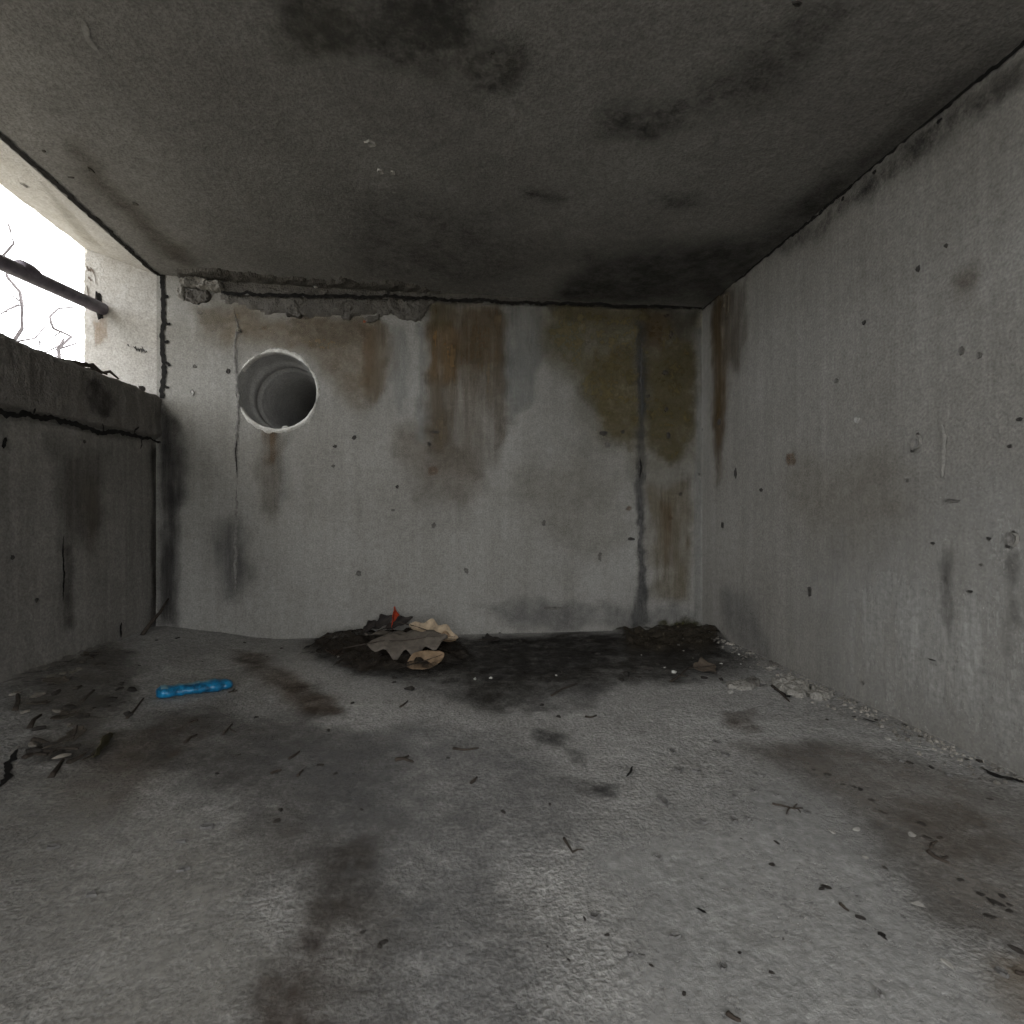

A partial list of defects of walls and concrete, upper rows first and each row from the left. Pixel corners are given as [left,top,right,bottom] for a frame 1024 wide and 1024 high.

spalling [175,268,441,319]
corrosion [712,291,740,449]
crack [0,408,161,449]